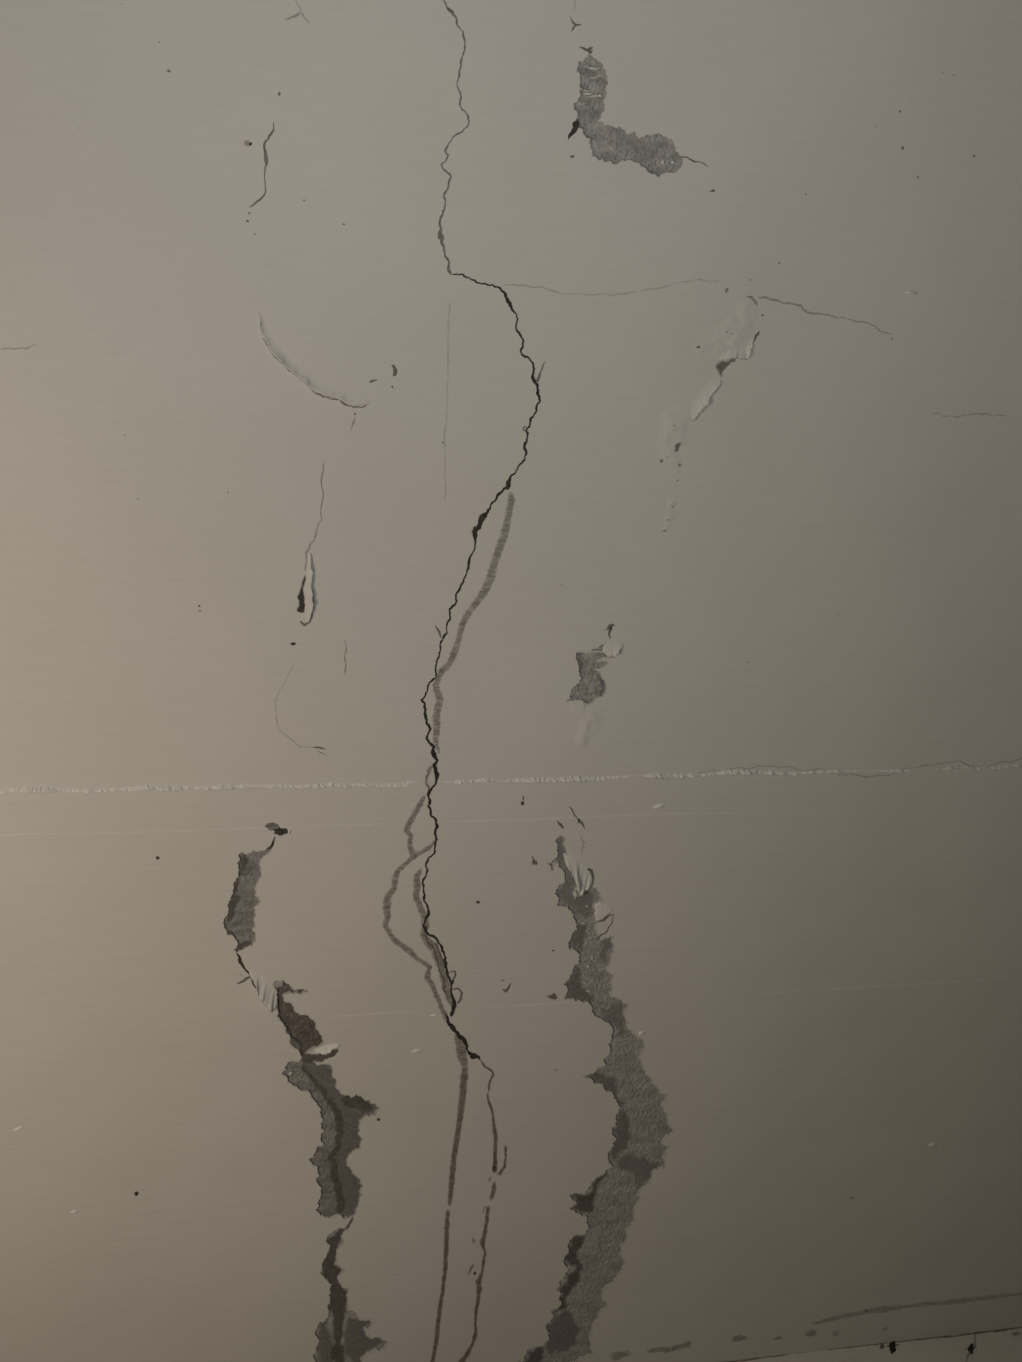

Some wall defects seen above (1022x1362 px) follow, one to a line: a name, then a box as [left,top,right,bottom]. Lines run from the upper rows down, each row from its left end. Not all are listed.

spalling [568,47,708,177]
crack [420,0,545,1092]
spalling [565,624,625,750]
spalling [223,823,388,1362]
spalling [519,806,674,1362]
crack [727,1354,787,1362]
crack [828,1327,1022,1350]